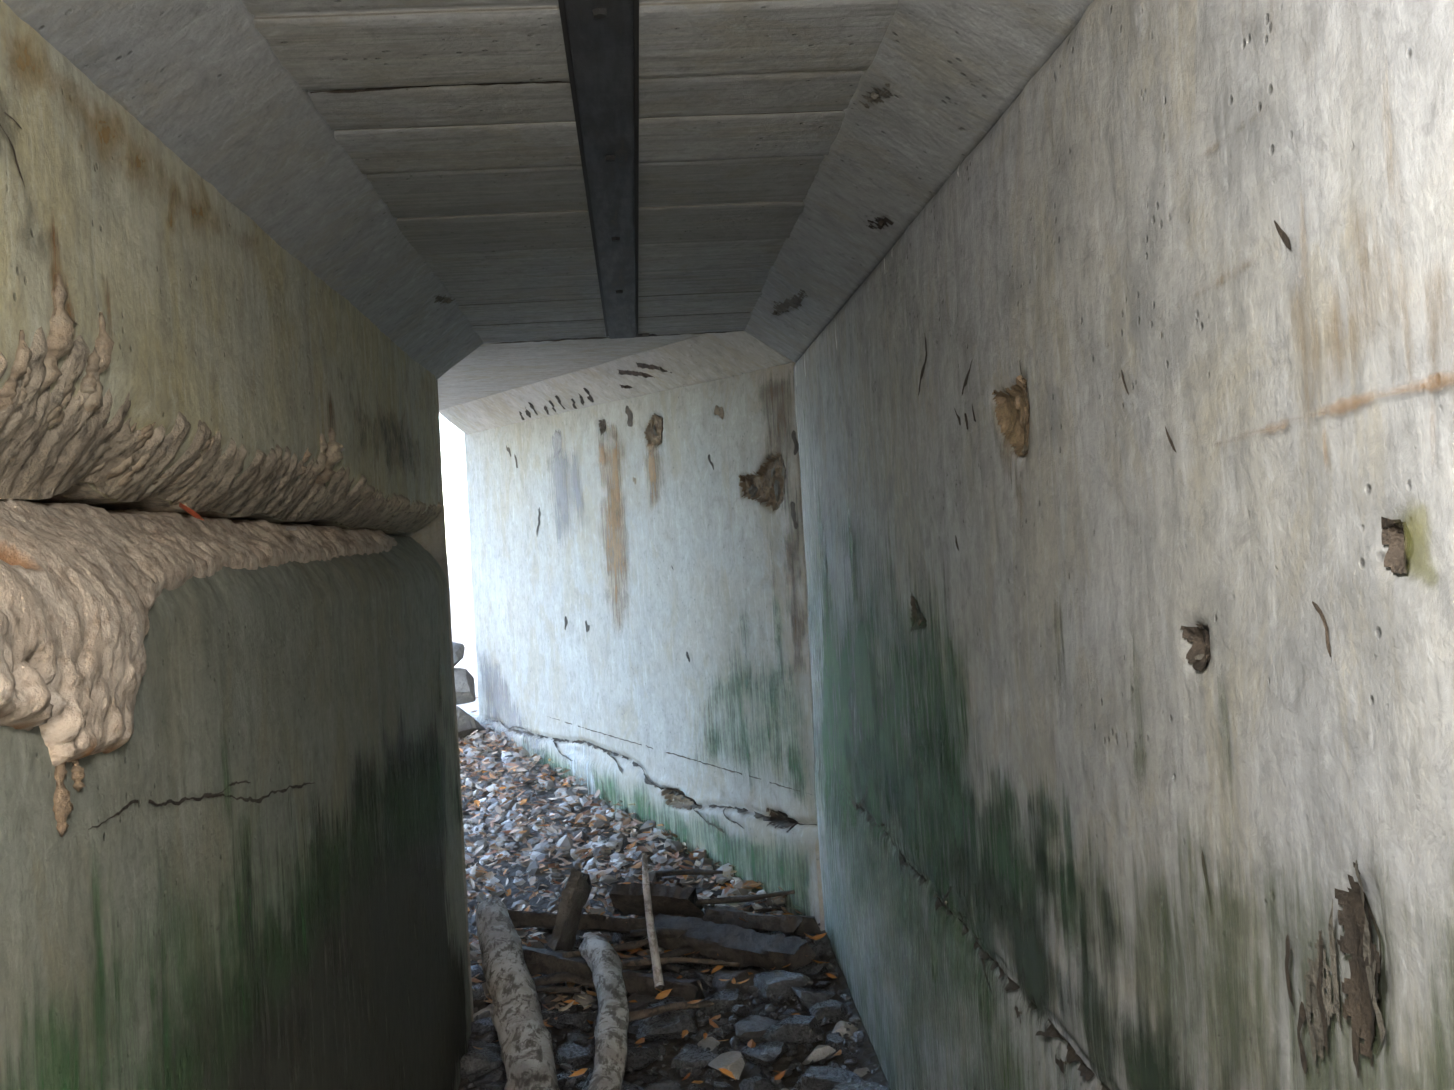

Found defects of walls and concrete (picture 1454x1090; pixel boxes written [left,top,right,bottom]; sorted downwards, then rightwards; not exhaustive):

leakage [0,273,114,428]
leakage [0,422,400,837]
rust [599,432,627,626]
spalling [617,362,672,447]
spalling [738,411,805,529]
spalling [1180,624,1211,671]
spalling [1381,517,1412,573]
crack [88,780,316,830]
leakage [154,716,468,1090]
crack [485,717,1110,1090]
leakage [951,840,1187,1090]
spalling [1285,860,1385,1078]